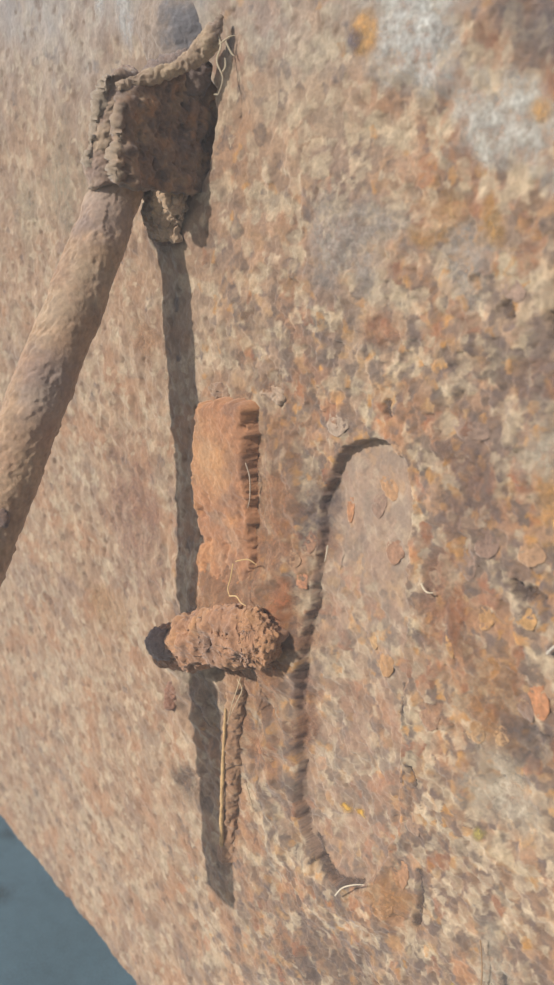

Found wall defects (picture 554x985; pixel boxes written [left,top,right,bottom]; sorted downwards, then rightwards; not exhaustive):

rust [348,14,376,52]
rust [326,414,349,437]
rust [517,543,547,568]
rust [513,608,537,631]
rust [515,680,550,722]
rust [466,722,510,747]